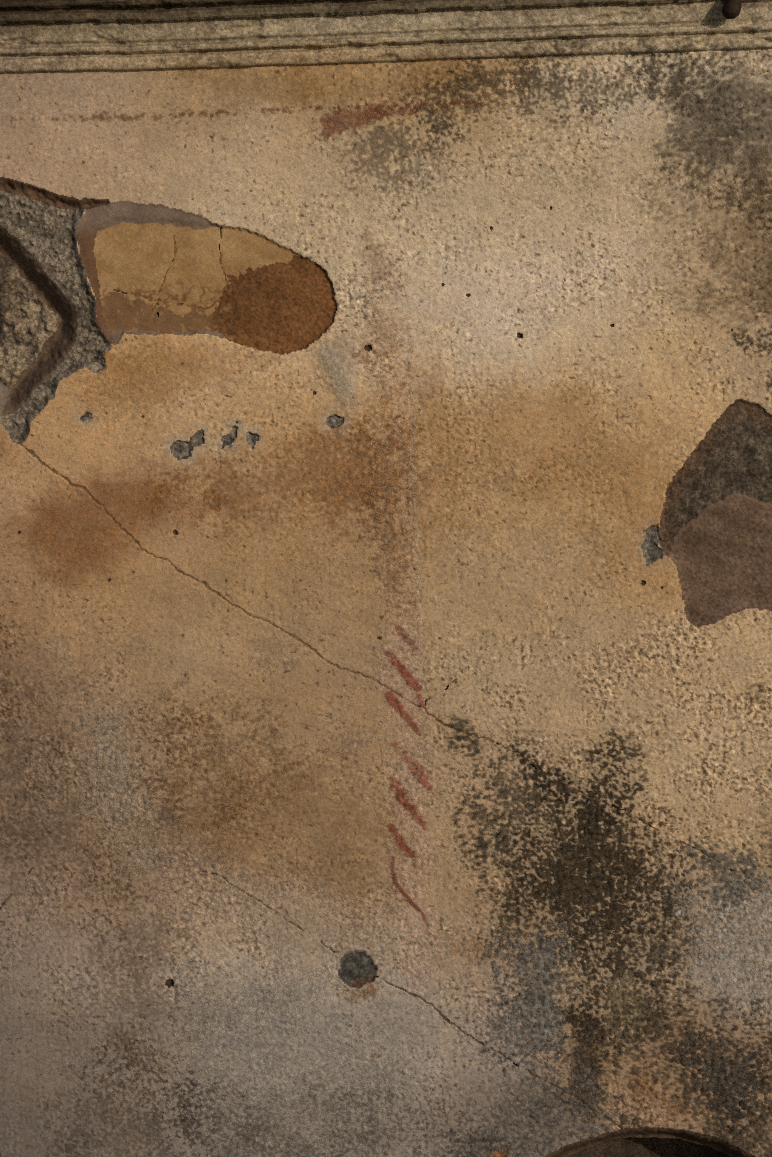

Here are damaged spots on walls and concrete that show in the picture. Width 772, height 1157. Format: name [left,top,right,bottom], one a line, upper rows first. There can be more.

leakage [654,45,772,213]
flaking render [0,177,337,444]
leakage [734,330,772,357]
flaking render [170,429,205,461]
flaking render [221,421,259,449]
flaking render [326,415,344,429]
flaking render [641,399,772,628]
crack [17,441,706,855]
crack [221,876,337,953]
leakage [444,716,772,1157]
crack [381,978,622,1129]